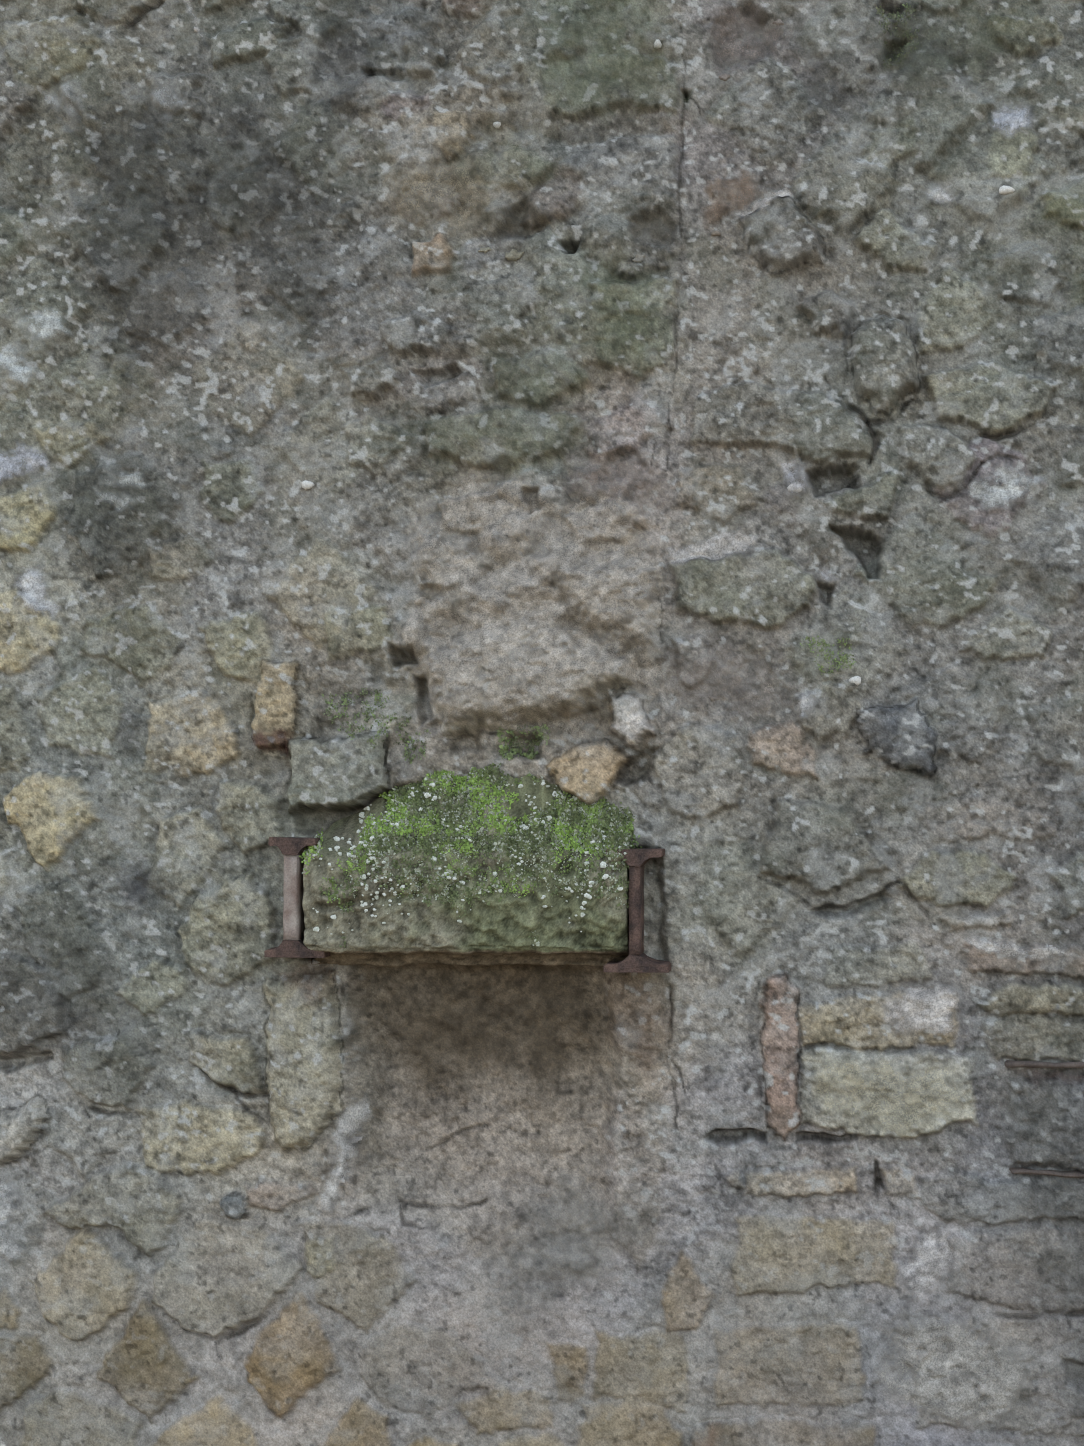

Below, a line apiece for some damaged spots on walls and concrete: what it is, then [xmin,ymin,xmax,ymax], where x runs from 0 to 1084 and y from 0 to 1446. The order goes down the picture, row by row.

water stain [389,965,588,1092]